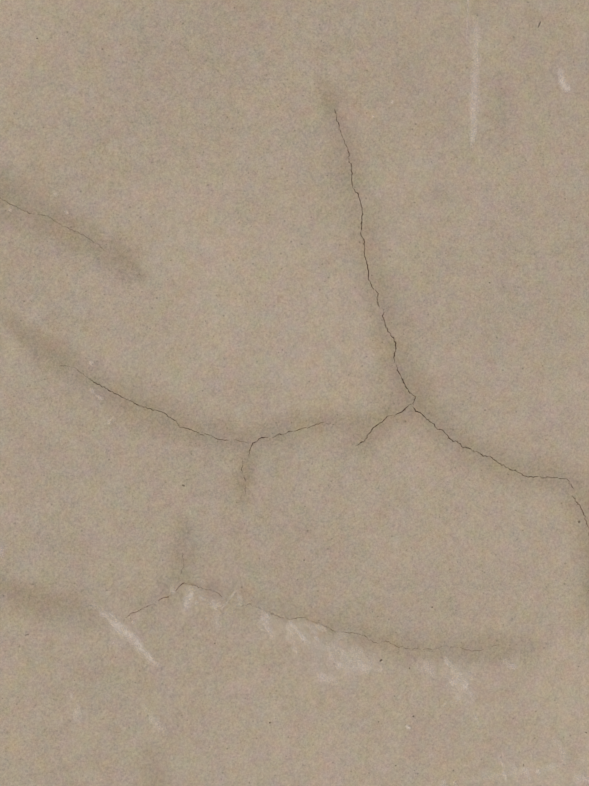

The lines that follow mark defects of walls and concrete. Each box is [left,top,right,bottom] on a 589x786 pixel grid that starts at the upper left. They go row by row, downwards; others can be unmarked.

crack [64,365,333,494]
crack [334,109,589,534]